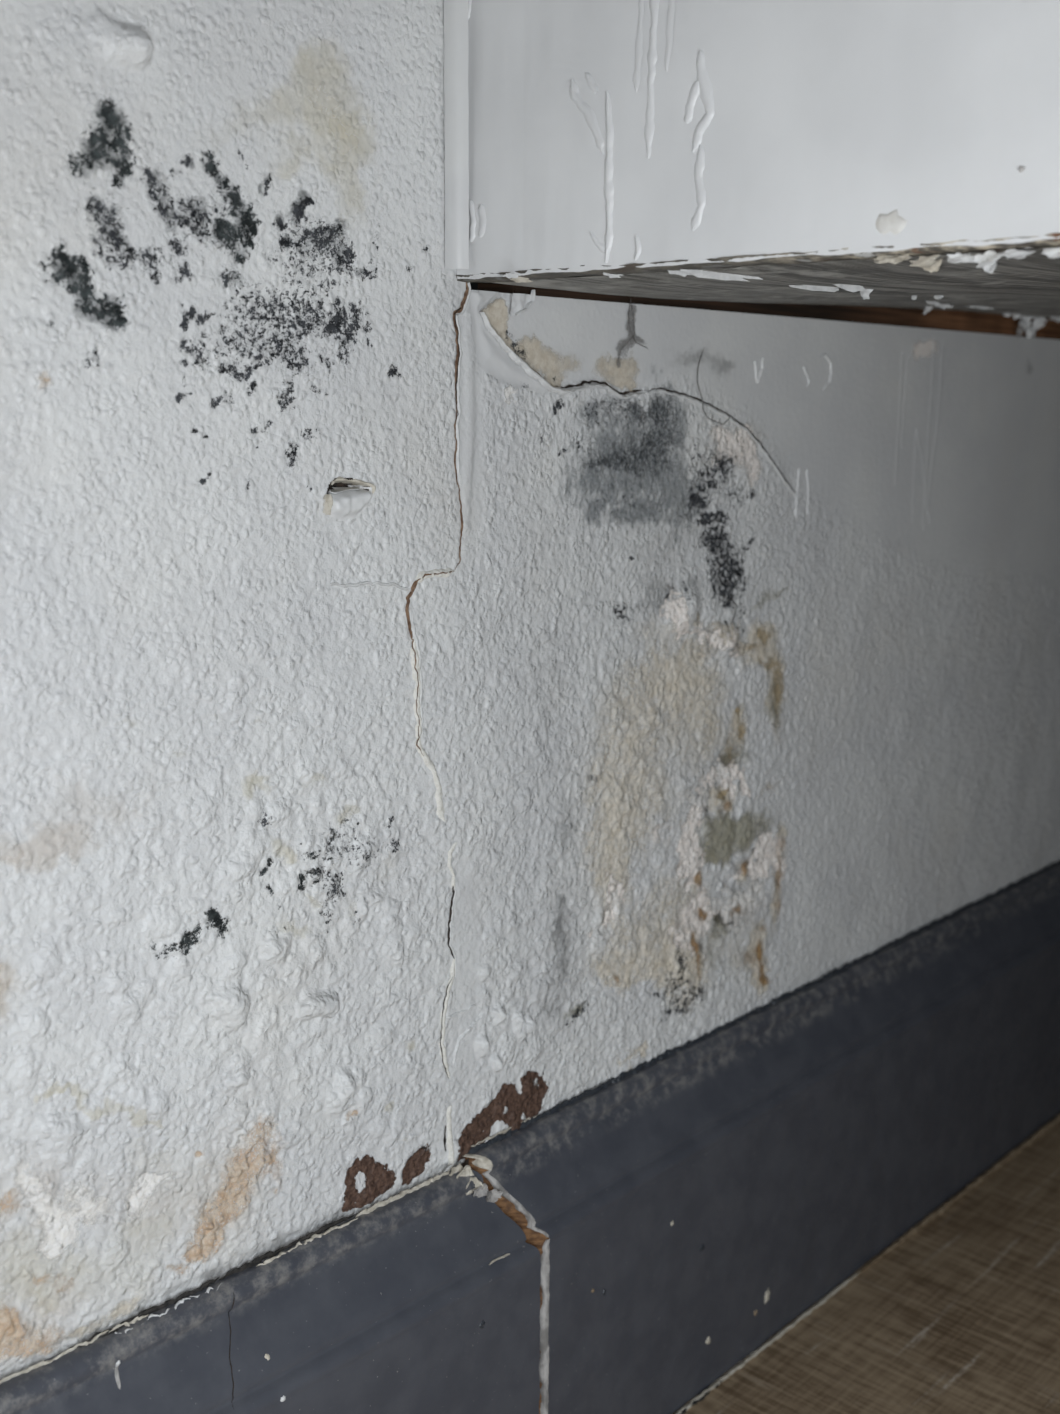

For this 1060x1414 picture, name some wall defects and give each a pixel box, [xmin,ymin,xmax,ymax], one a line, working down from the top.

water stain [39,98,380,449]
peeling [668,269,763,282]
peeling [789,284,873,300]
peeling [873,248,1060,273]
peeling [470,272,644,403]
peeling [912,295,1060,339]
water stain [285,429,320,467]
hole [323,476,376,521]
water stain [539,397,787,1023]
crack [330,282,550,1414]